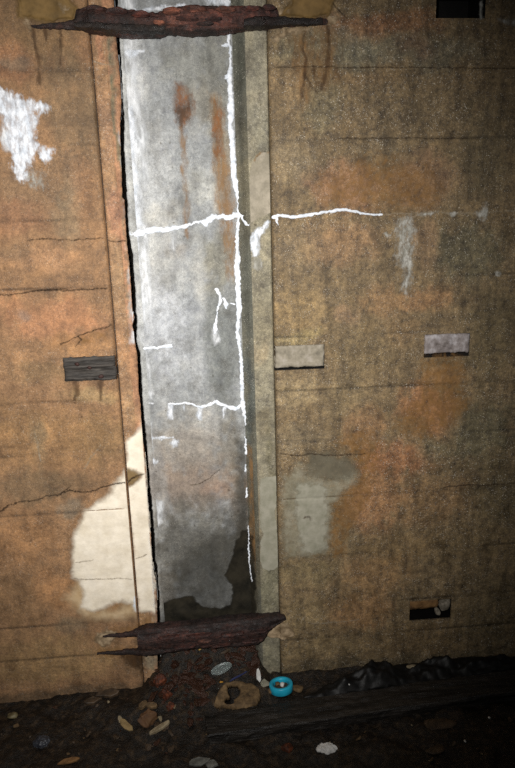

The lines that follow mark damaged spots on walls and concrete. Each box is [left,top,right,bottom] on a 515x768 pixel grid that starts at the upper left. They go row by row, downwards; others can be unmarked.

crack [102,0,121,8]
rust [86,4,276,26]
leakage [0,87,51,186]
rust [175,86,191,128]
rust [213,147,236,257]
leakage [213,34,246,426]
crack [272,208,383,225]
leakage [385,217,415,294]
crack [0,36,249,623]
peeling [69,427,158,618]
peeling [295,483,328,553]
leakage [163,526,256,621]